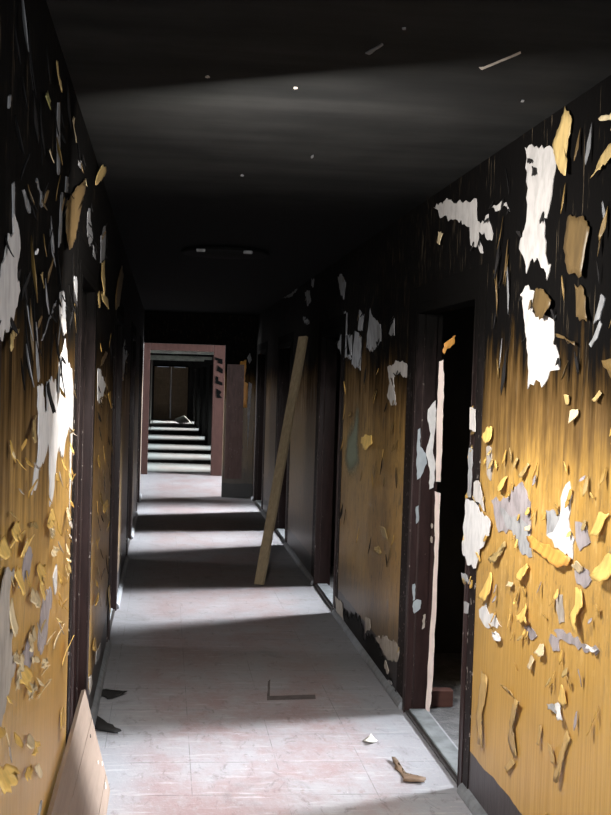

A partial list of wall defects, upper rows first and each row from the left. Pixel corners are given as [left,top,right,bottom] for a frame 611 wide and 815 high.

peeling [0,0,124,794]
peeling [335,274,395,393]
peeling [376,360,407,412]
peeling [435,167,579,395]
peeling [515,107,611,347]
peeling [564,394,579,423]
peeling [602,359,611,378]
flaking render [412,335,456,712]
peeling [461,406,611,721]